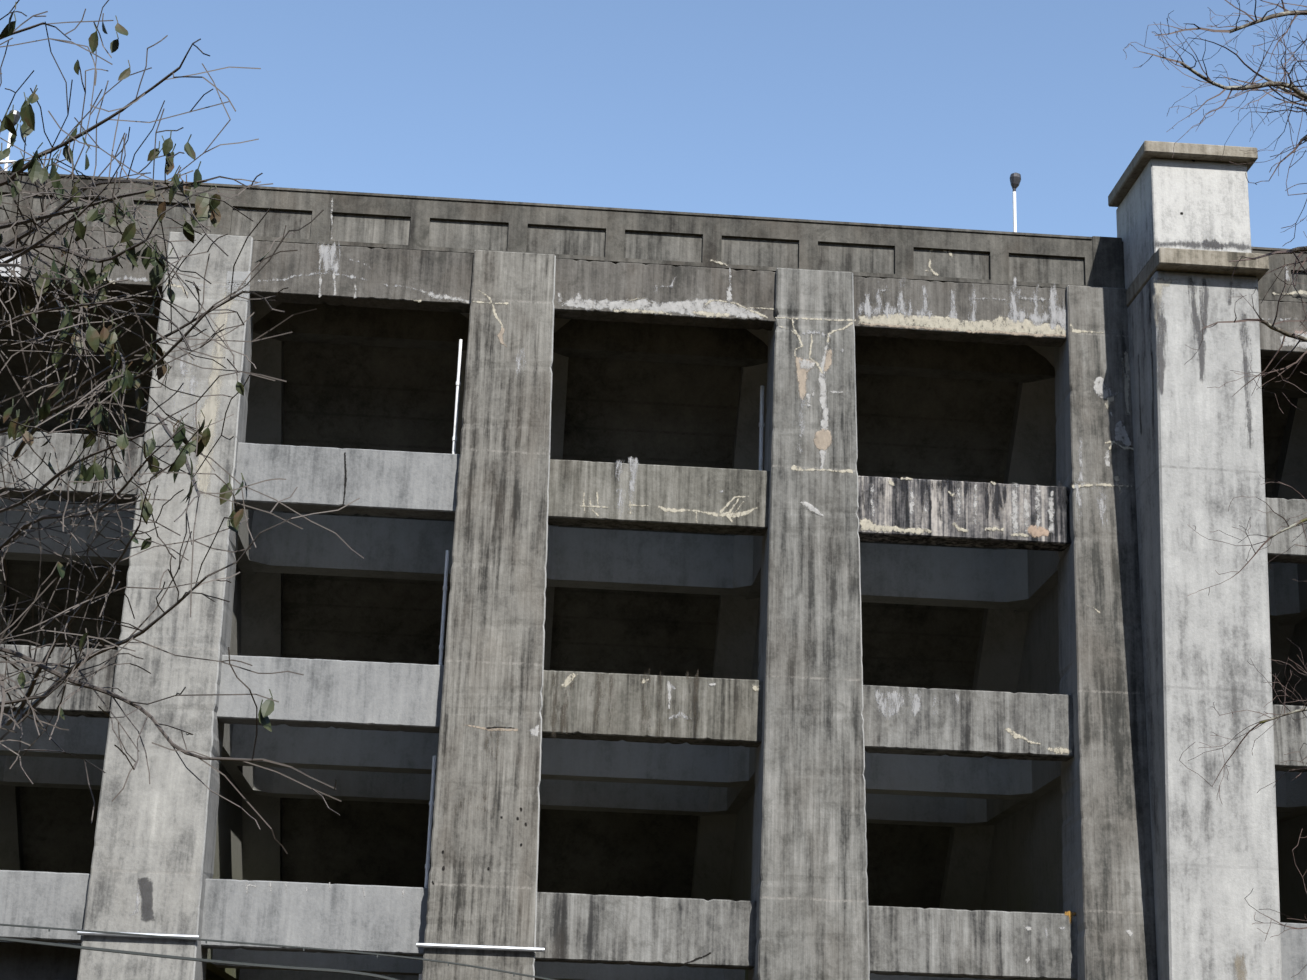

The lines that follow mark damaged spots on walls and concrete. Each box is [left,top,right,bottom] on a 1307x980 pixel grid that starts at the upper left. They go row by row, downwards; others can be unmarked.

efflorescence [859,286,932,319]
spalling [859,313,1067,337]
efflorescence [949,278,1067,330]
spalling [1094,377,1134,451]
water stain [1122,278,1209,434]
water stain [1241,314,1251,445]
water stain [862,441,1083,533]